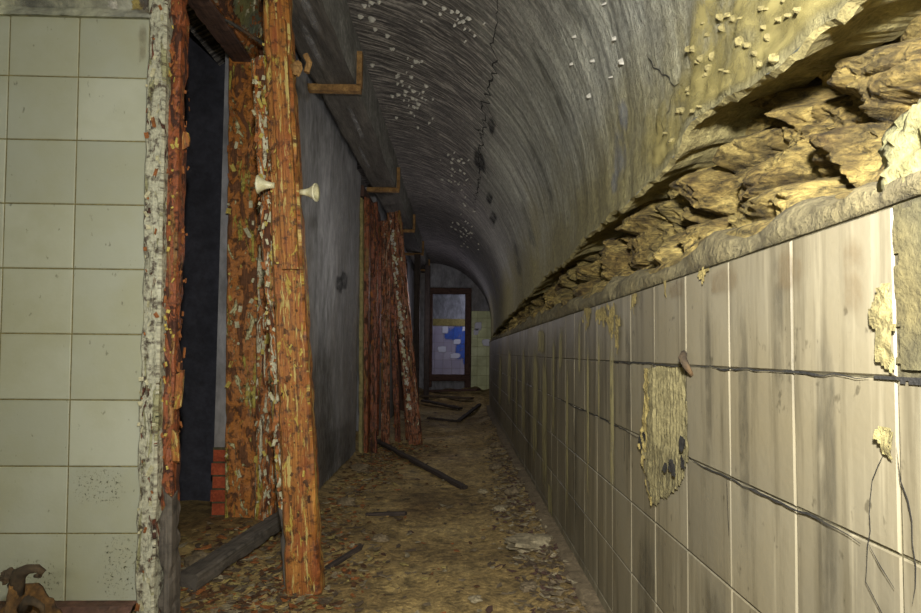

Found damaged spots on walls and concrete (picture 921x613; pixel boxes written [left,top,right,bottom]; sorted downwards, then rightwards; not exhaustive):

peeling [131,0,181,29]
peeling [144,34,190,158]
crack [469,0,499,211]
spalling [474,0,921,353]
peeling [144,269,187,405]
peeling [224,0,311,520]
crack [559,398,635,448]
spalling [638,350,693,506]
crack [606,360,869,379]
spalling [873,426,894,460]
spalling [868,197,921,385]
crack [687,447,916,613]